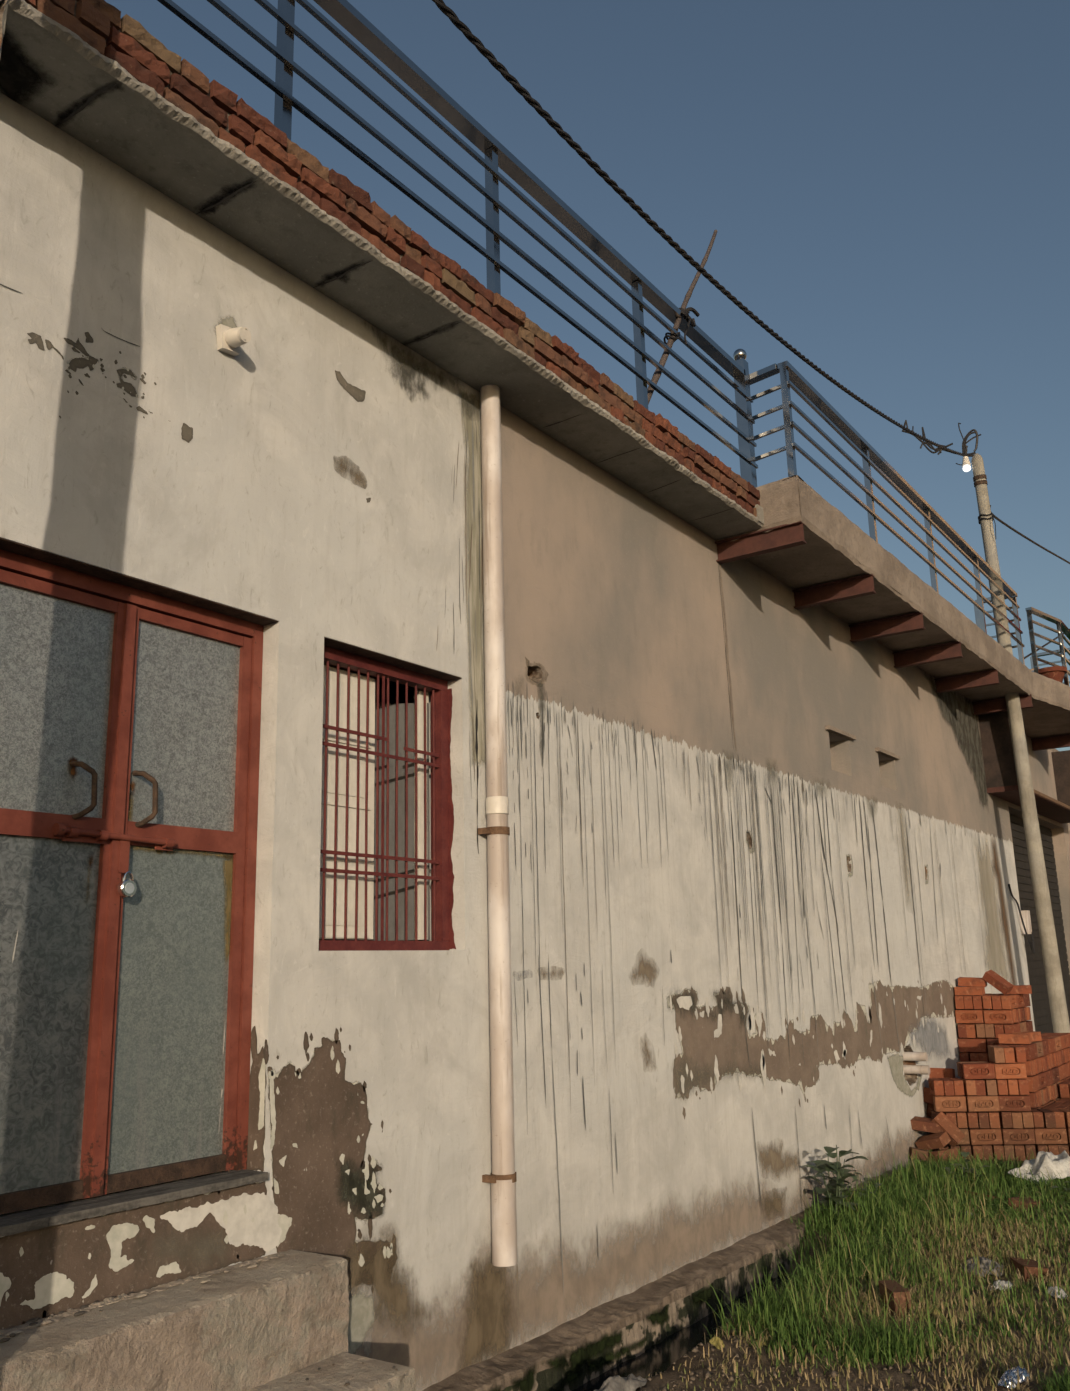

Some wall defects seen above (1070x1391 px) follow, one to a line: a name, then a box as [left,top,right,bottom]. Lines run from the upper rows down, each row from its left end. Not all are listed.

crack [0,0,8,48]
peeling [27,332,157,418]
peeling [335,370,366,402]
leakage [348,678,1007,1388]
peeling [667,980,962,1119]
peeling [0,1026,398,1330]